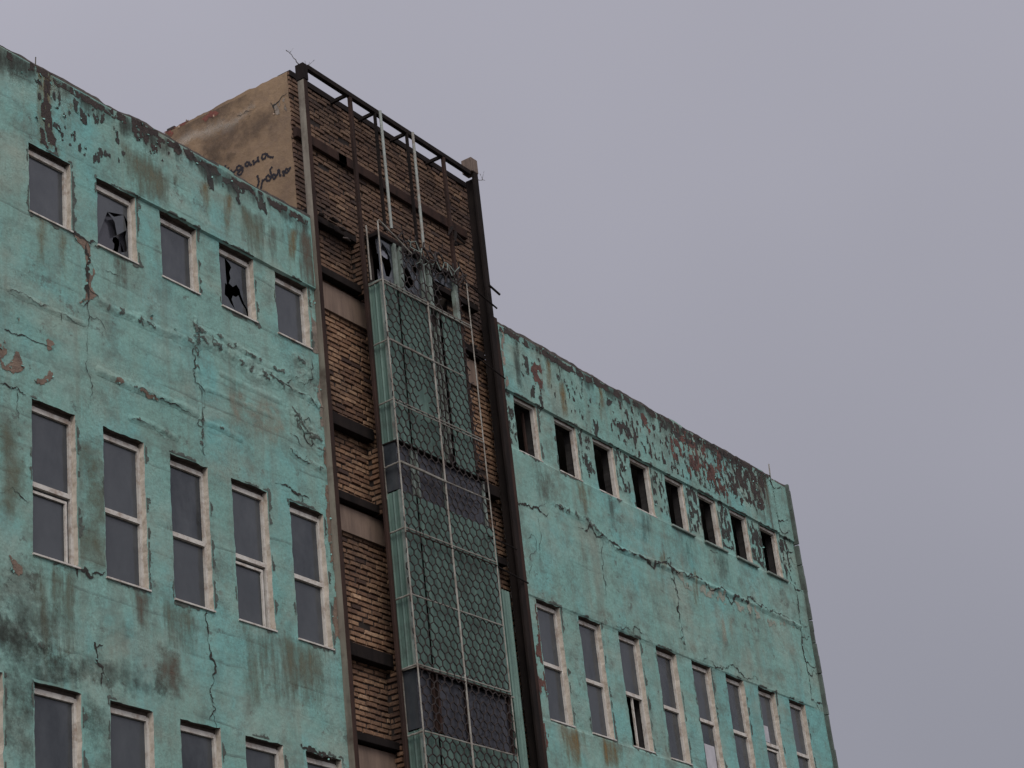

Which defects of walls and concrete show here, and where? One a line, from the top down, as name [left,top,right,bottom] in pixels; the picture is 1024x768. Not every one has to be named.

peeling [21,62,308,303]
peeling [0,340,25,374]
crack [12,231,118,406]
crack [141,329,205,458]
crack [266,364,324,470]
peeling [499,326,796,584]
crack [205,611,218,728]
crack [518,478,823,711]